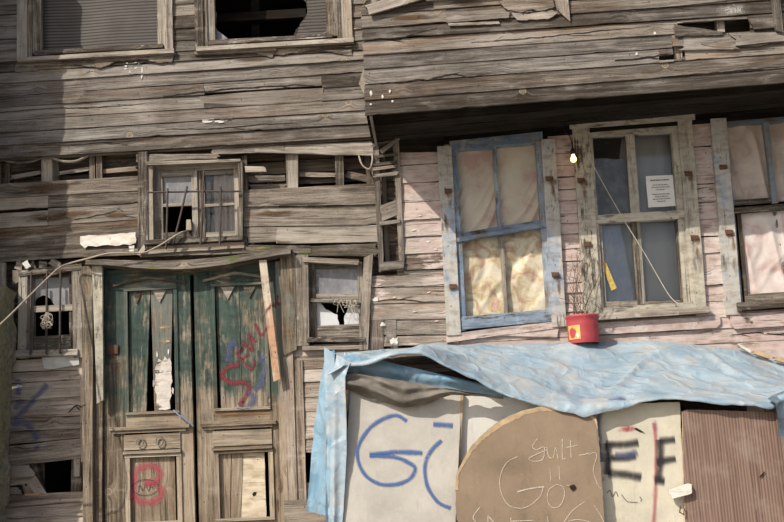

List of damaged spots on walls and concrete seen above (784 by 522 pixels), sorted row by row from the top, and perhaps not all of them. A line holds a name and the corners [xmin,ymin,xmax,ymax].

crack [731,330,784,338]
peeling [153,339,174,410]